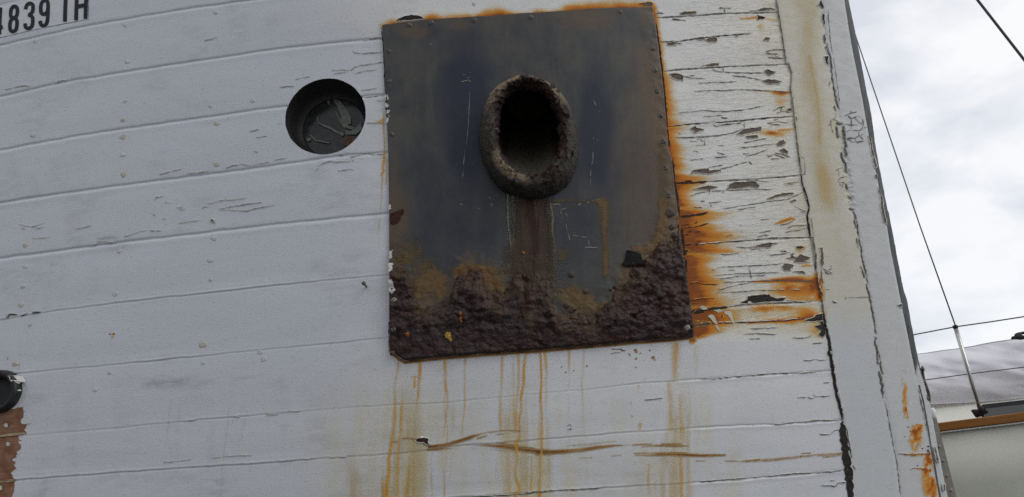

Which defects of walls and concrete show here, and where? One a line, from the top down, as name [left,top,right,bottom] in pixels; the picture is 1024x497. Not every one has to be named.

peeling [750,6,776,21]
peeling [669,72,686,82]
peeling [762,68,783,85]
peeling [736,126,762,139]
peeling [691,167,760,192]
peeling [767,191,796,203]
rust [382,2,825,497]
peeling [749,241,825,274]
crack [655,1,940,497]
peeling [0,375,28,497]
rust [382,393,410,497]
rust [903,384,938,497]